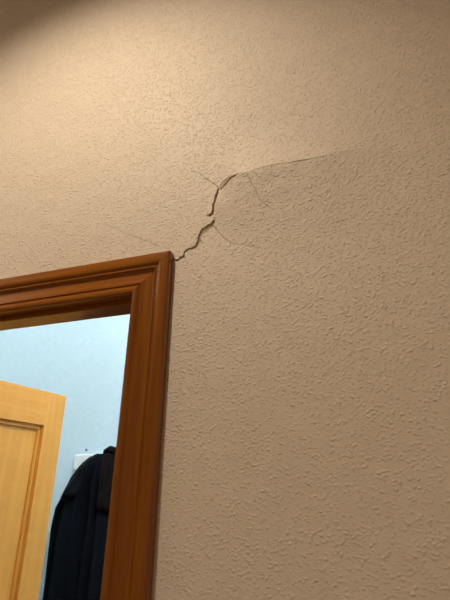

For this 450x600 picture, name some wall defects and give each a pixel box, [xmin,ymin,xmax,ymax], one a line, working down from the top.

crack [173,171,259,262]